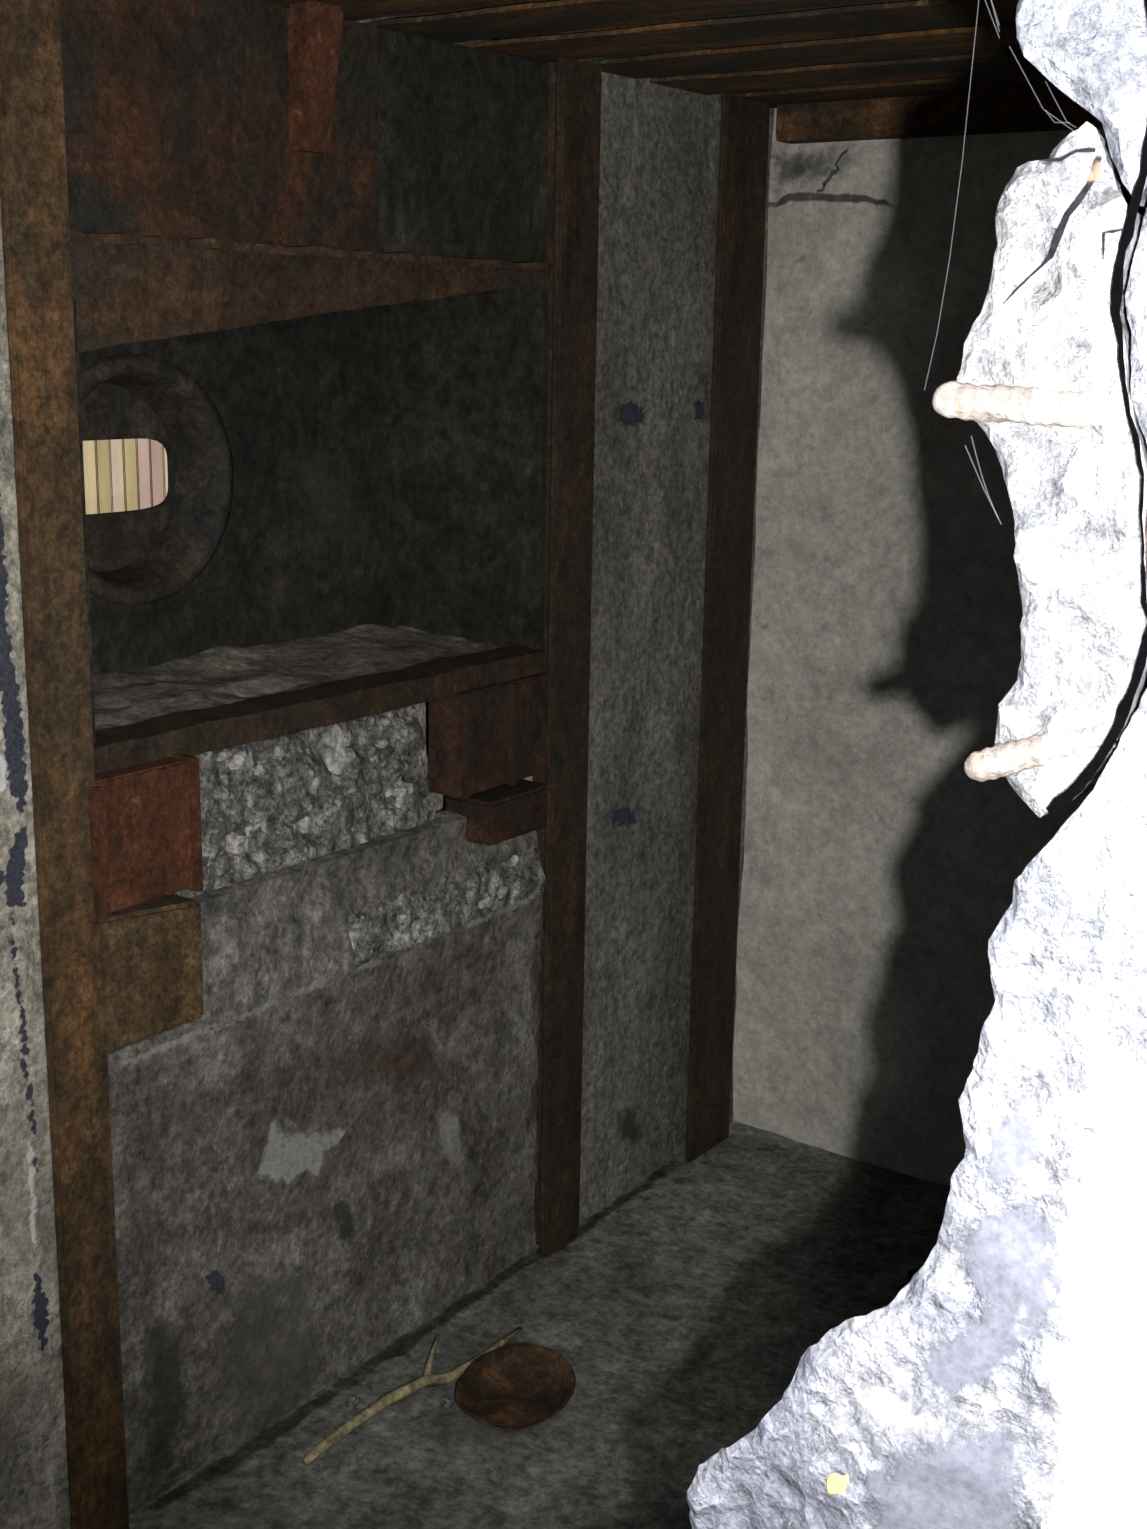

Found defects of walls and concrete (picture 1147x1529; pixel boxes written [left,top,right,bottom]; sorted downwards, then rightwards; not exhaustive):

crack [768,150,888,207]
spalling [932,381,1134,429]
crack [1003,133,1147,818]
spalling [964,722,1117,782]
crack [0,494,38,1173]
crack [31,1273,50,1351]